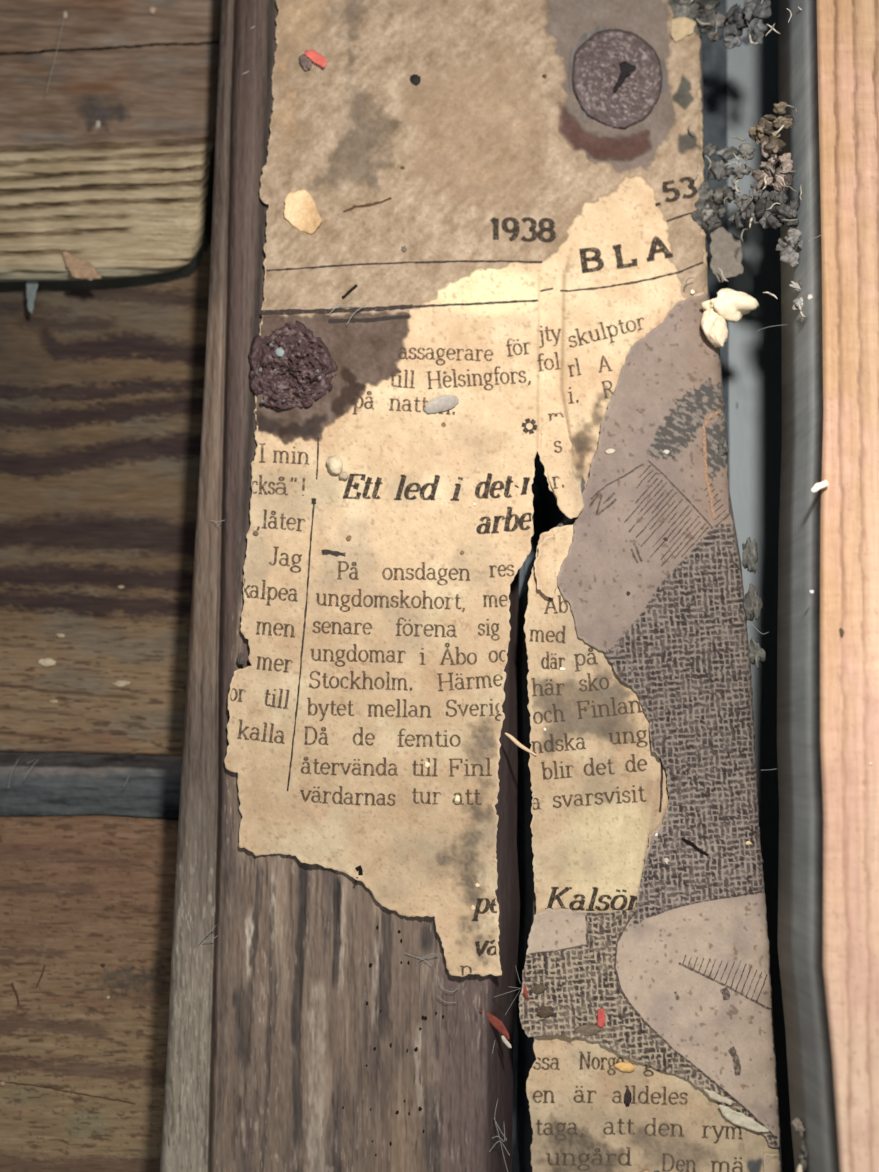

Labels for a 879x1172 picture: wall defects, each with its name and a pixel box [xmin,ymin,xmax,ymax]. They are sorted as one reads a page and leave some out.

peeling [597,1008,606,1028]